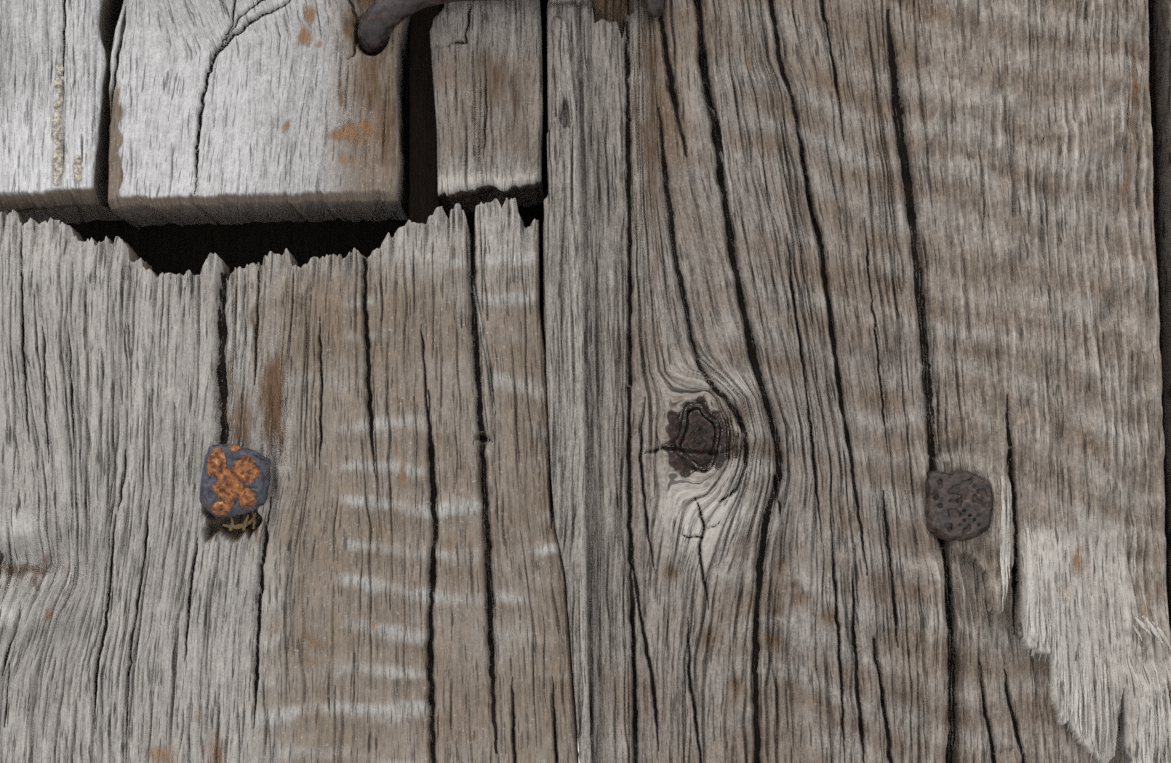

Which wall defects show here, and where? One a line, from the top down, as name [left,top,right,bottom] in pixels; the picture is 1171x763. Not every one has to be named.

rust [345,0,376,41]
crack [194,0,291,194]
rust [207,369,260,515]
rust [261,353,284,447]